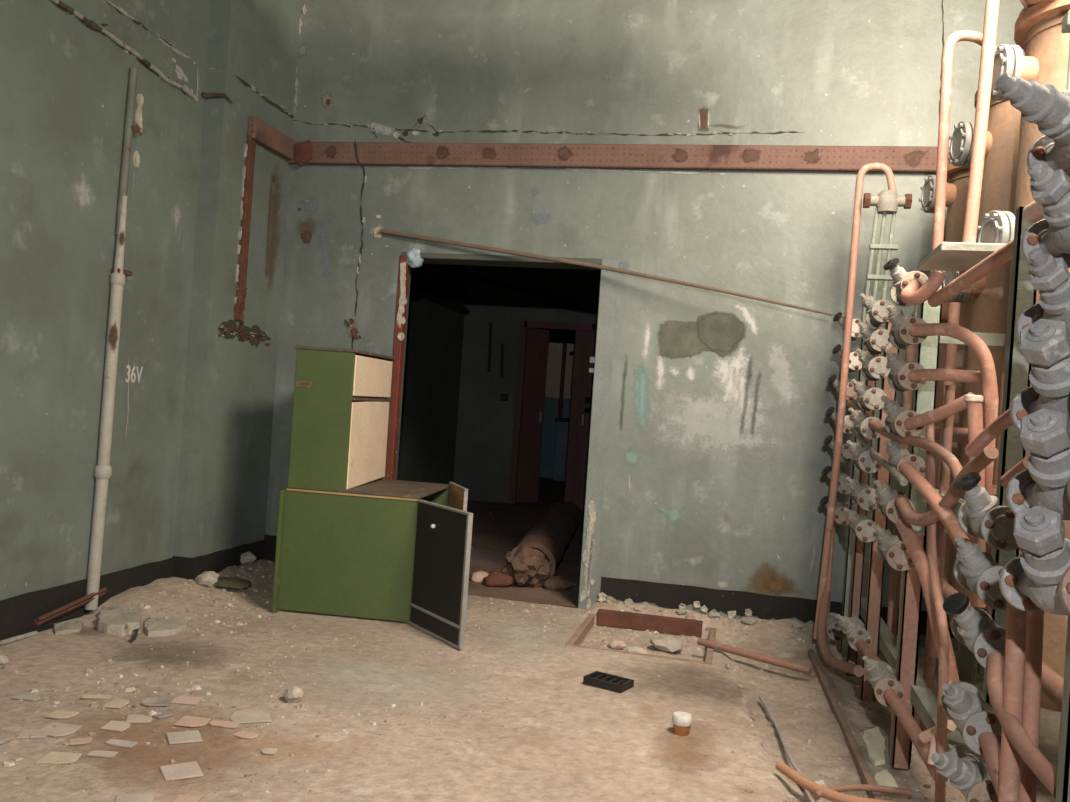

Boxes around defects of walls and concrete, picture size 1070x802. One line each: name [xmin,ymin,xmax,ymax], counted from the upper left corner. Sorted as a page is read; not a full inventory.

crack [937,0,945,108]
rust [673,149,687,162]
rust [742,149,759,162]
rust [805,149,819,163]
crack [66,0,805,349]